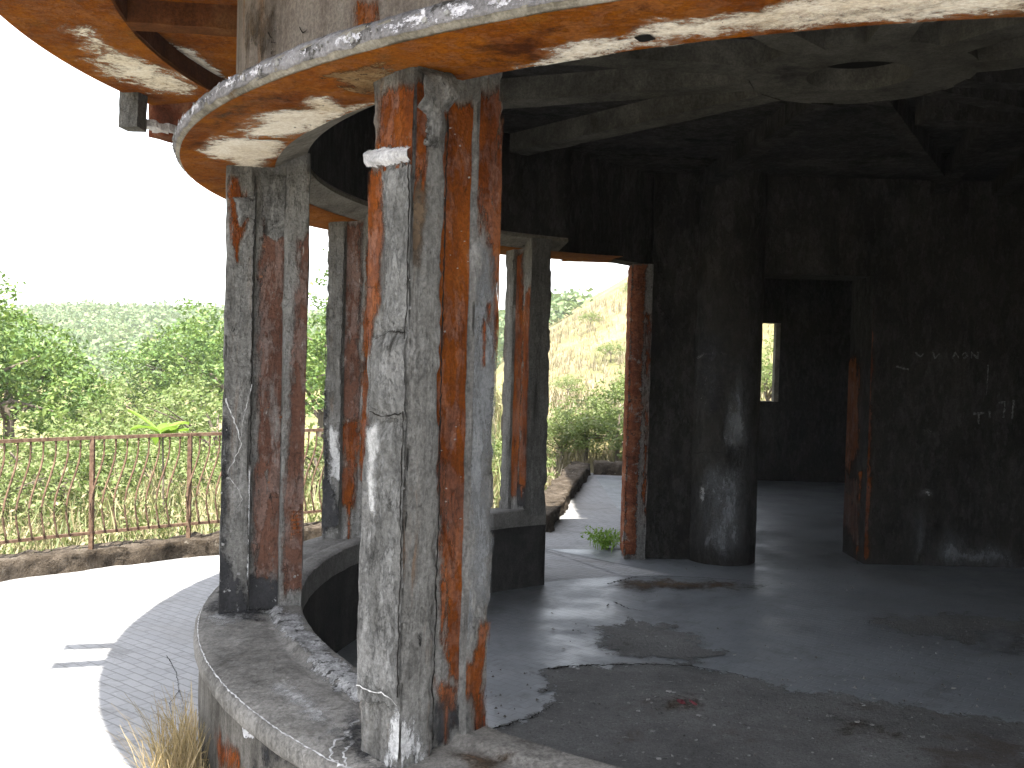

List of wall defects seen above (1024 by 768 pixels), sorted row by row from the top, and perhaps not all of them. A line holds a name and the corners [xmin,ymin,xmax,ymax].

peeling [172,0,523,164]
crack [225,176,256,591]
spalling [245,418,406,711]
crack [356,411,404,706]
crack [376,157,410,384]
rust [434,85,531,746]
rust [180,0,1024,596]
crack [329,719,360,768]